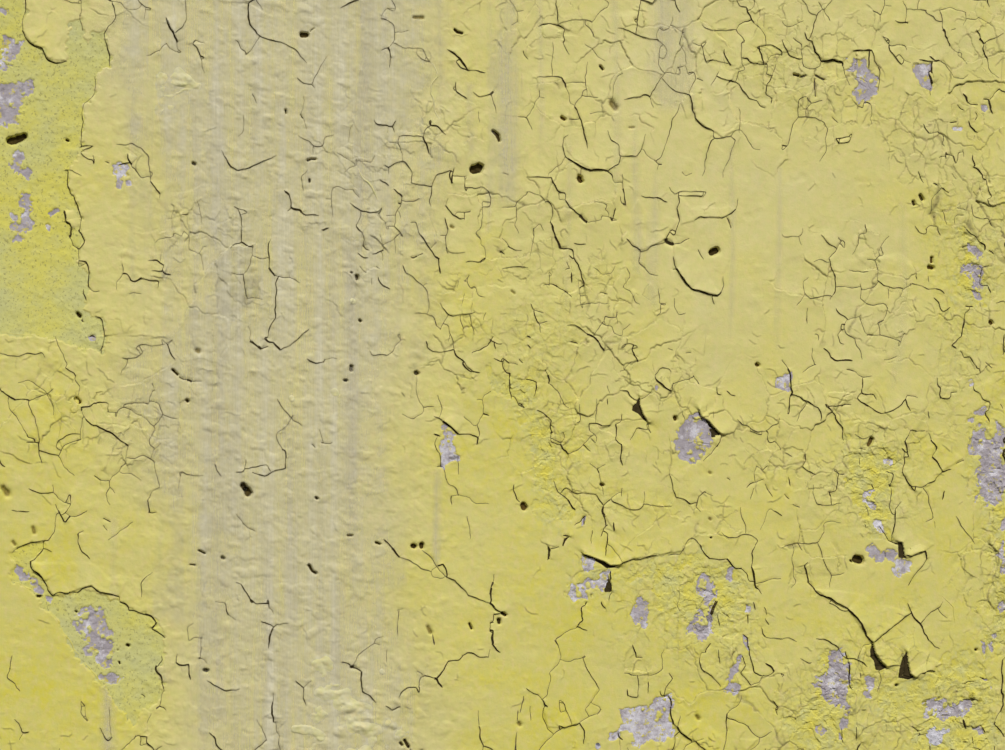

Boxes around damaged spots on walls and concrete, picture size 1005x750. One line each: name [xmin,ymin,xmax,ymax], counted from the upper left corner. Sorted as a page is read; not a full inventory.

crack [22,0,66,64]
spalling [846,57,879,104]
peeling [0,0,113,355]
crack [65,0,205,382]
spalling [434,415,479,470]
crack [231,0,1005,750]
spalling [671,411,722,464]
peeling [9,541,166,726]
crack [0,337,331,750]
spalling [608,693,675,750]
peeling [564,546,759,696]
peeling [781,406,1005,750]